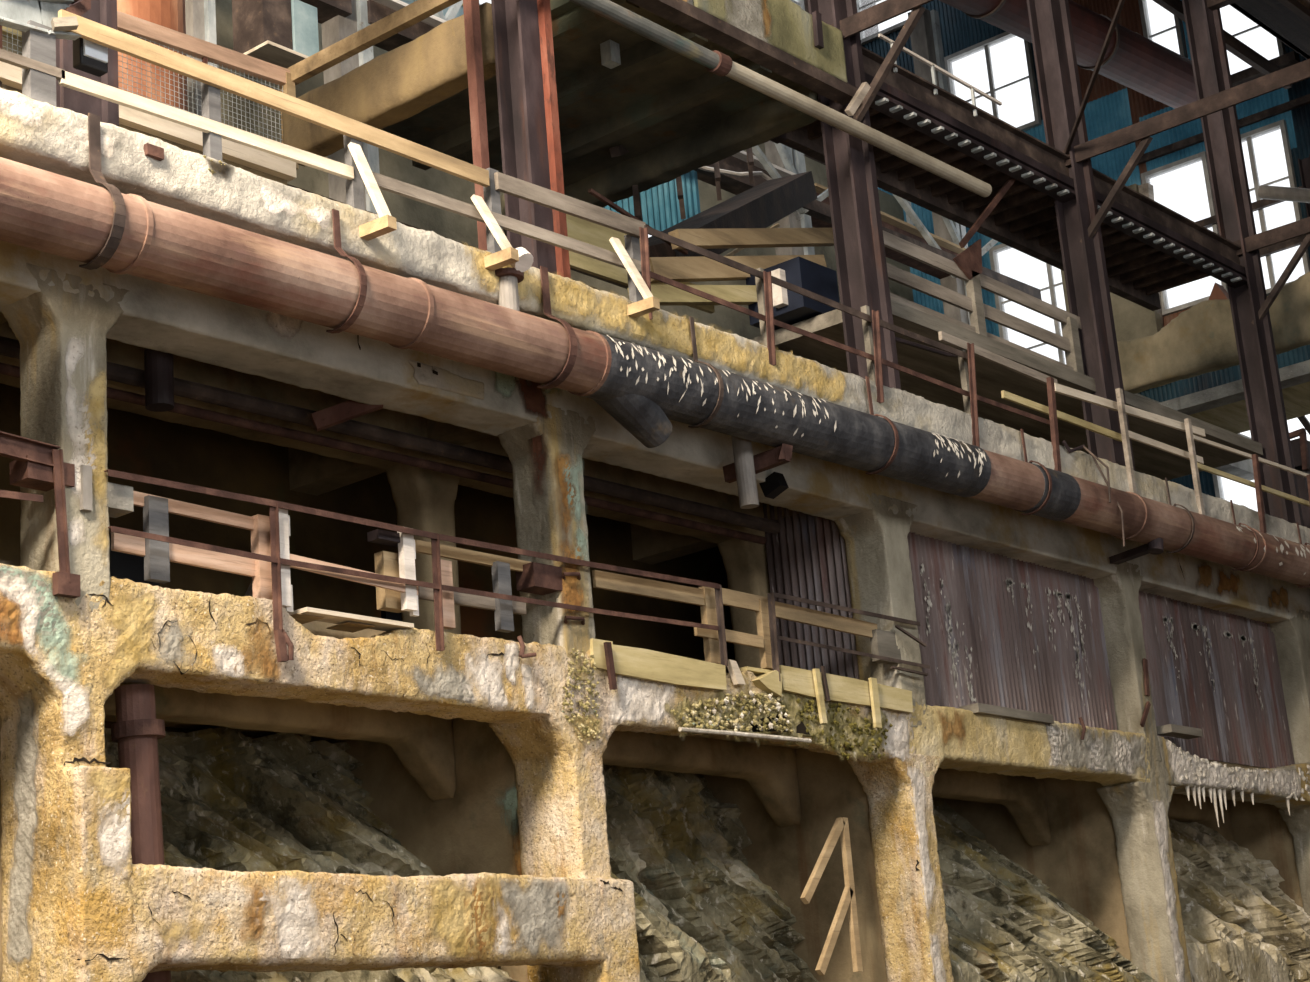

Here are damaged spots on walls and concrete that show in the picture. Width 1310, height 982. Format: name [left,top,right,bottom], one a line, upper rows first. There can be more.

rust [514,377,548,418]
rust [529,434,586,616]
rust [0,594,25,644]
leakage [1046,724,1146,774]
leakage [1166,741,1310,801]